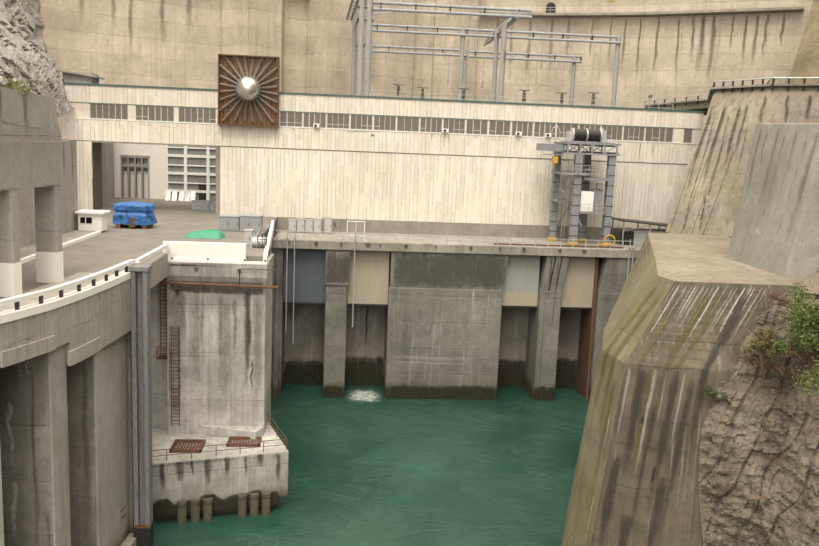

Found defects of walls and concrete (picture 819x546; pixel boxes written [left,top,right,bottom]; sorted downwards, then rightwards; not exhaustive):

leakage [170,264,263,386]
leakage [628,371,678,489]
leakage [642,287,696,360]
leakage [666,288,751,471]
leakage [601,458,619,533]
leakage [647,479,670,546]